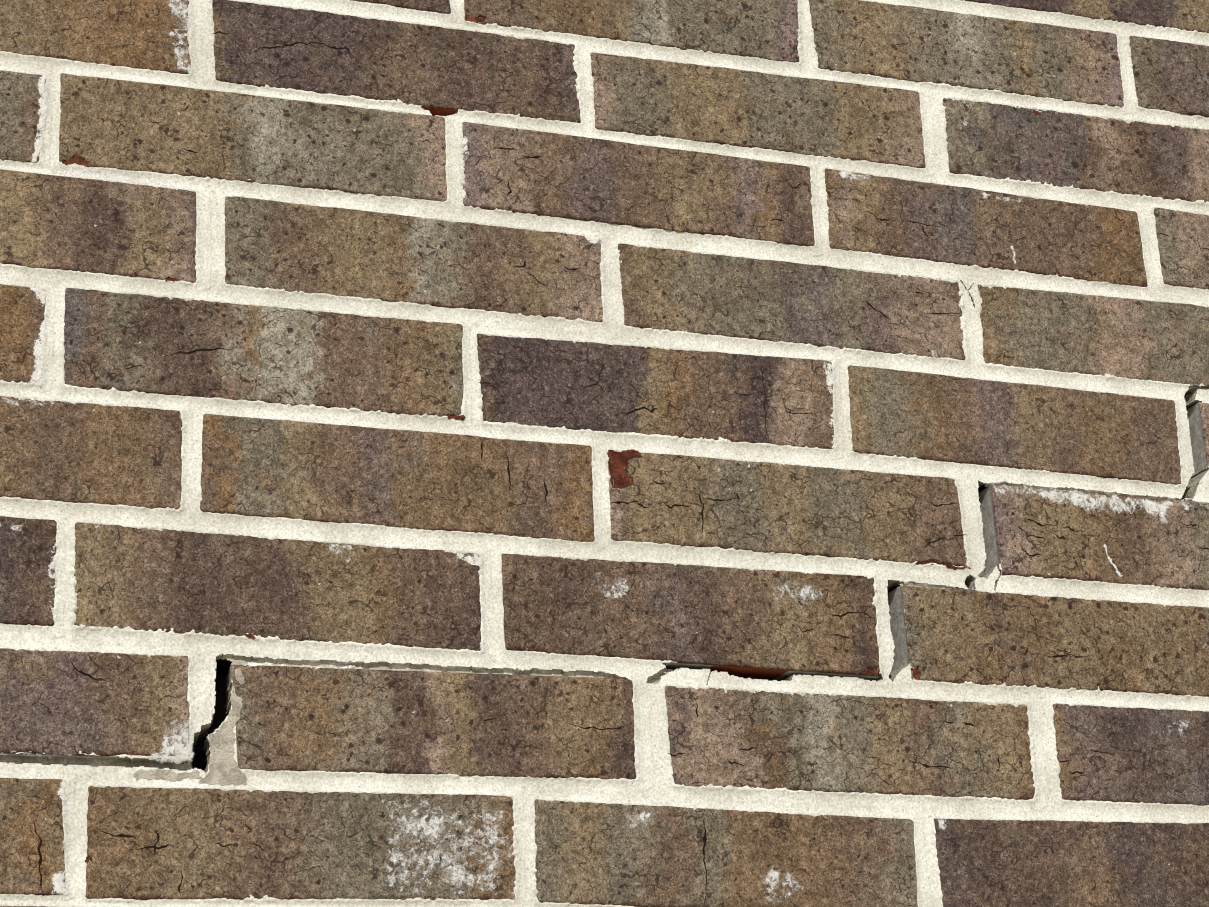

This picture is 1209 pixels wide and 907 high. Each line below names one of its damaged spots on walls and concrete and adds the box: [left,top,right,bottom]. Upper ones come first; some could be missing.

leakage [166,0,193,73]
crack [1184,385,1208,436]
crack [927,465,1209,549]
leakage [994,486,1189,523]
crack [798,518,1084,638]
crack [0,654,803,774]
crack [875,663,910,681]
leakage [382,800,512,894]